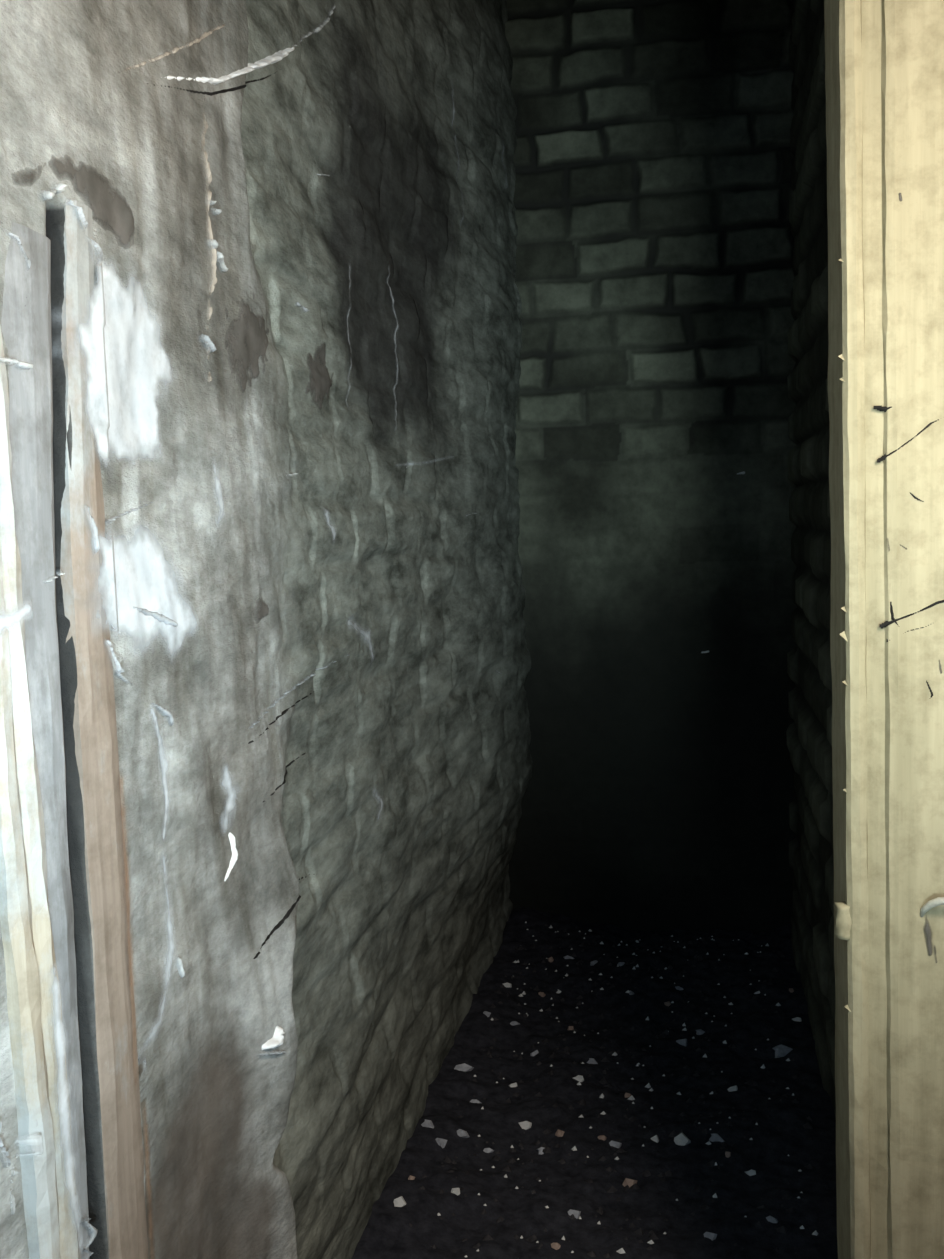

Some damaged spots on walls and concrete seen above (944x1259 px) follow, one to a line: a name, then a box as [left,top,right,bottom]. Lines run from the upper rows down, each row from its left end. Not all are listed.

spalling [16,157,135,247]
spalling [0,358,33,369]
peeling [79,241,171,458]
crack [248,654,349,744]
crack [263,753,305,802]
crack [253,874,314,959]